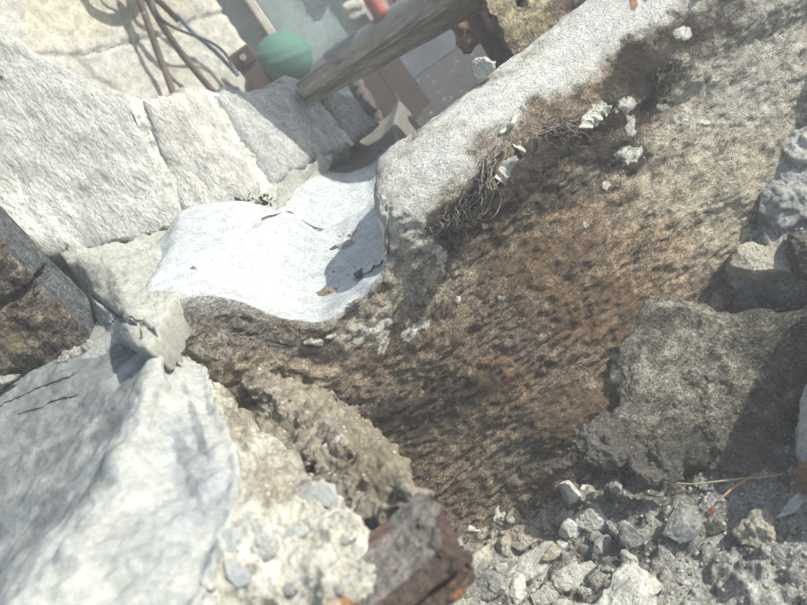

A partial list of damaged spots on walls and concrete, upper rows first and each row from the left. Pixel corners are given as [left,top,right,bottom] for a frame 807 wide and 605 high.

damp [423,10,742,246]
damp [492,227,646,348]
damp [298,334,351,365]
damp [361,356,532,440]
damp [527,385,615,448]